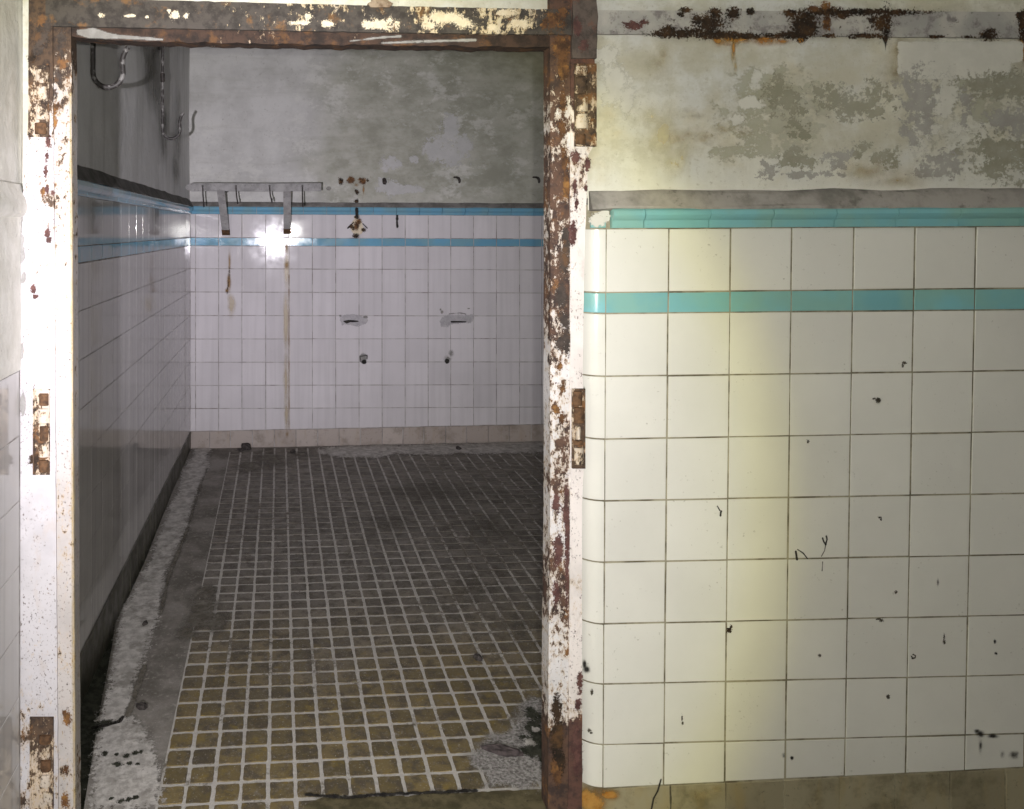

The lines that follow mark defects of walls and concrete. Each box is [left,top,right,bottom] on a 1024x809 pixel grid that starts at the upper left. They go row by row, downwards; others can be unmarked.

rust [285,12,335,29]
rust [361,16,400,32]
rust [621,0,942,65]
rust [961,28,1002,42]
rust [1016,9,1024,61]
rust [26,19,69,197]
peeling [726,61,1024,188]
rust [326,175,369,238]
rust [550,404,565,425]
rust [551,464,570,617]
rust [546,671,617,809]